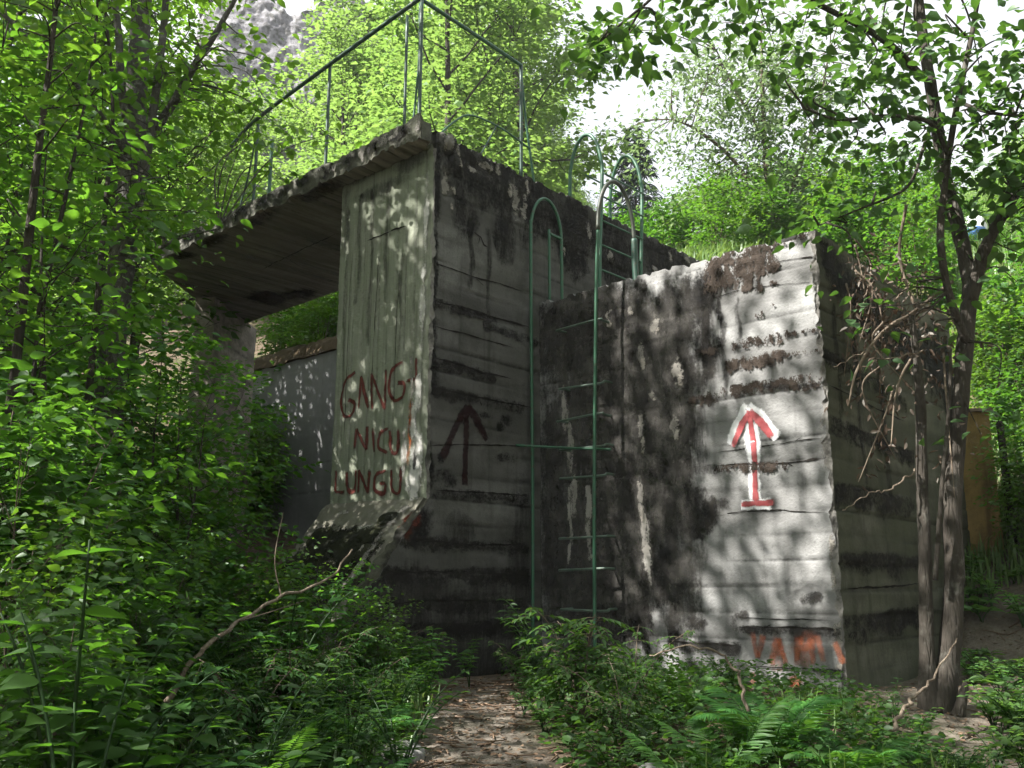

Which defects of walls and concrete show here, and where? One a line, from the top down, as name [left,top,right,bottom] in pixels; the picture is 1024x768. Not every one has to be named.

crack [343,226,405,444]
damp [333,135,954,679]
peeling [703,232,807,296]